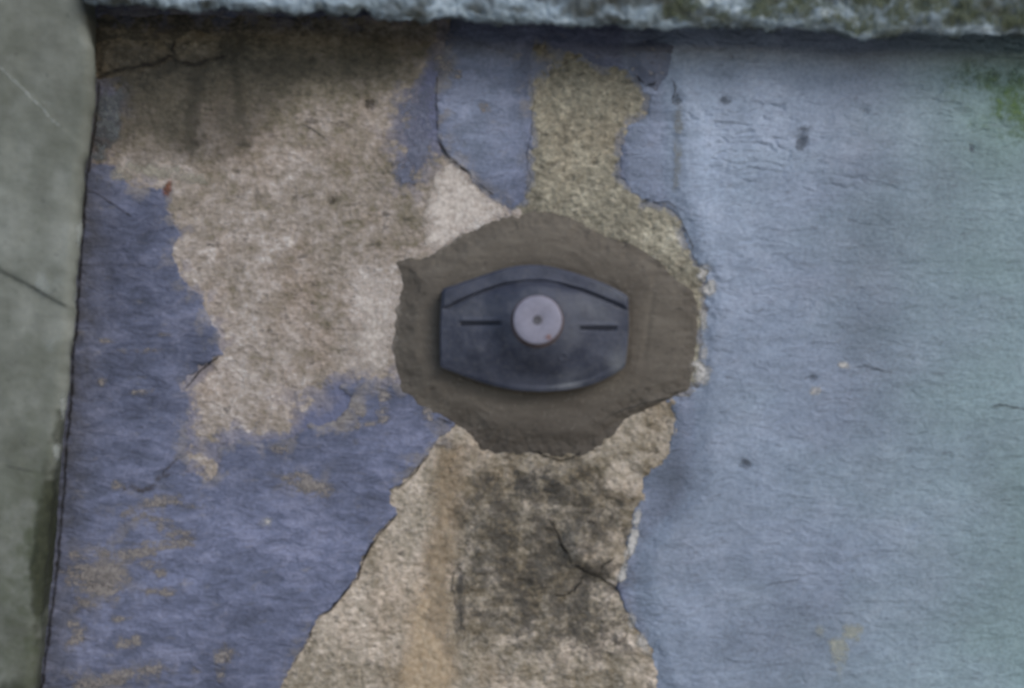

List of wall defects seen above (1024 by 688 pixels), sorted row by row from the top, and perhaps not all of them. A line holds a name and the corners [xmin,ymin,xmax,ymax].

peeling [65,494,194,645]
crack [40,42,225,688]
peeling [91,14,716,688]
crack [546,522,618,597]